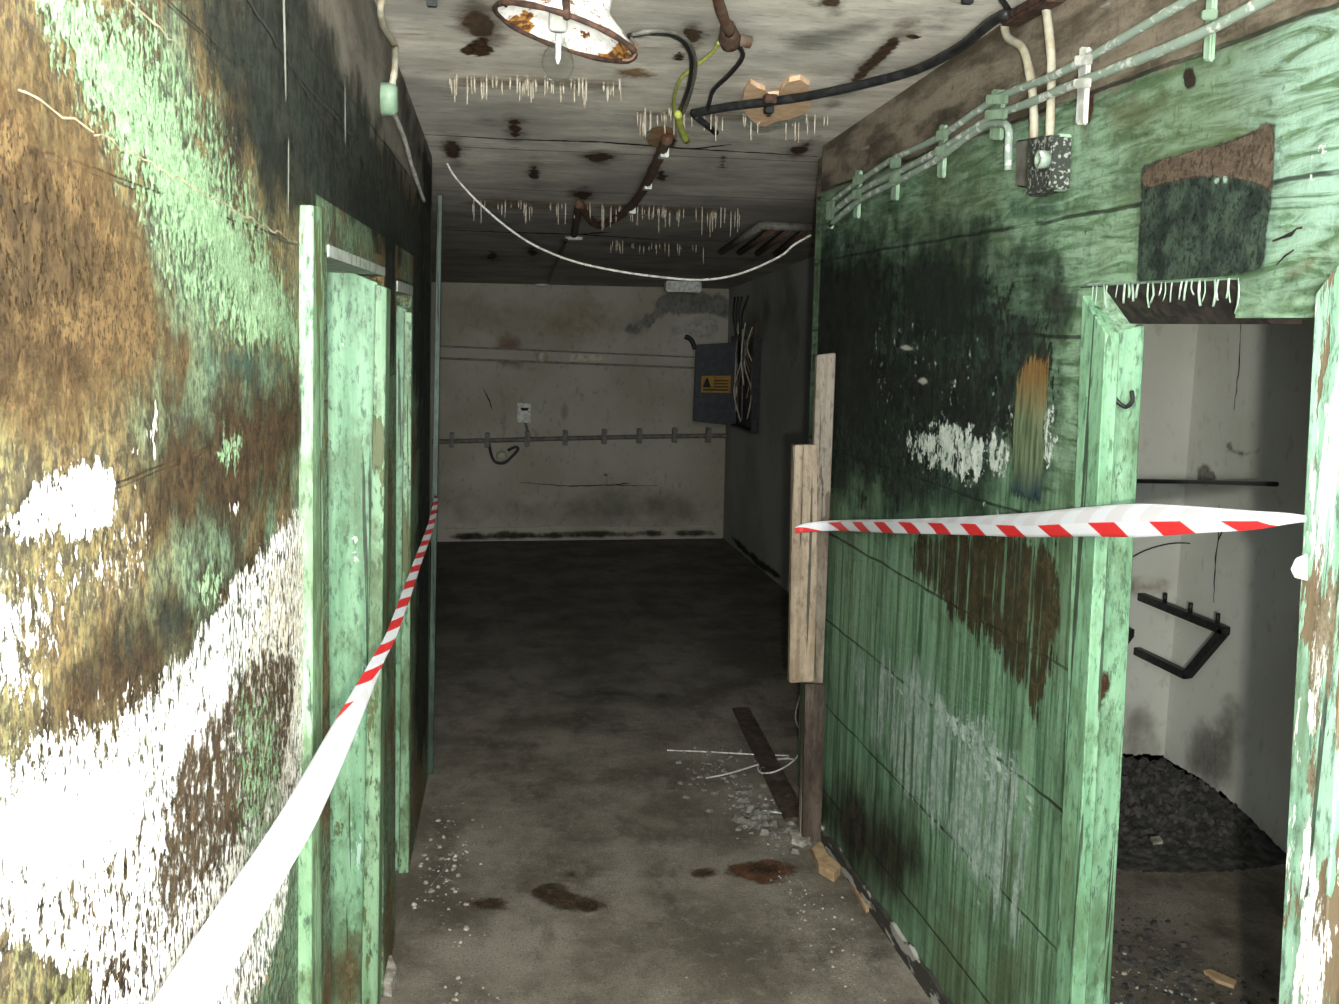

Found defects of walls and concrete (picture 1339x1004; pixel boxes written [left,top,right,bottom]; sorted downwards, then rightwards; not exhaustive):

leakage [1137,123,1276,282]
leakage [0,56,302,745]
peeling [875,323,937,384]
peeling [904,377,1014,489]
leakage [911,534,1060,729]
leakage [91,630,296,1004]
leakage [533,873,599,912]
peeling [1292,563,1339,1004]